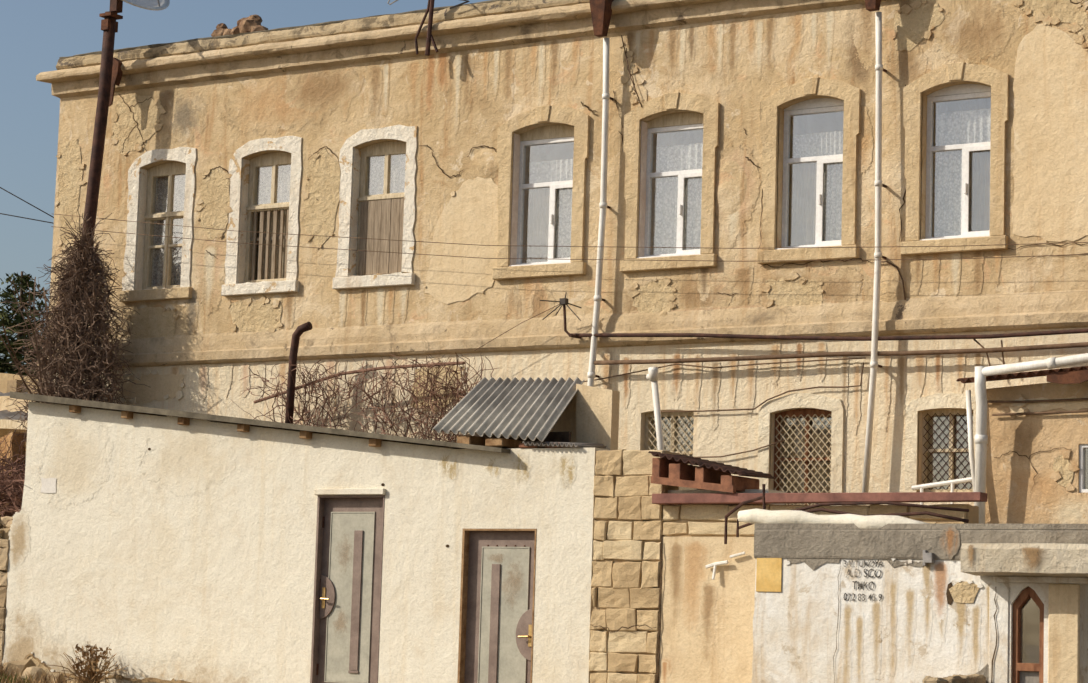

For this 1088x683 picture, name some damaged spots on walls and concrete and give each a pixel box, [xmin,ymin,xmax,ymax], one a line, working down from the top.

damp [453,46,516,135]
damp [529,38,580,106]
crack [119,94,153,152]
peeling [1011,0,1088,242]
crack [420,145,497,178]
crack [1008,243,1088,260]
crack [994,447,1072,486]
damp [842,572,994,683]
flaking render [24,652,77,683]
flaking render [100,674,191,683]